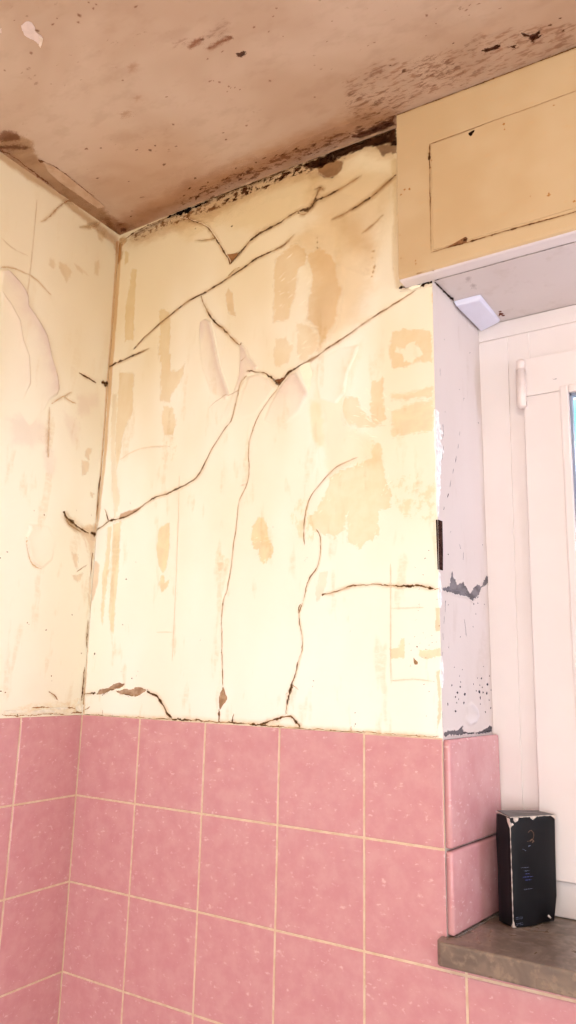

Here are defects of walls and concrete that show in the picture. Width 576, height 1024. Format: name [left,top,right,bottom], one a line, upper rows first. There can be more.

leakage [135,119,397,238]
leakage [481,18,564,52]
crack [48,47,576,738]
peeling [308,328,488,632]